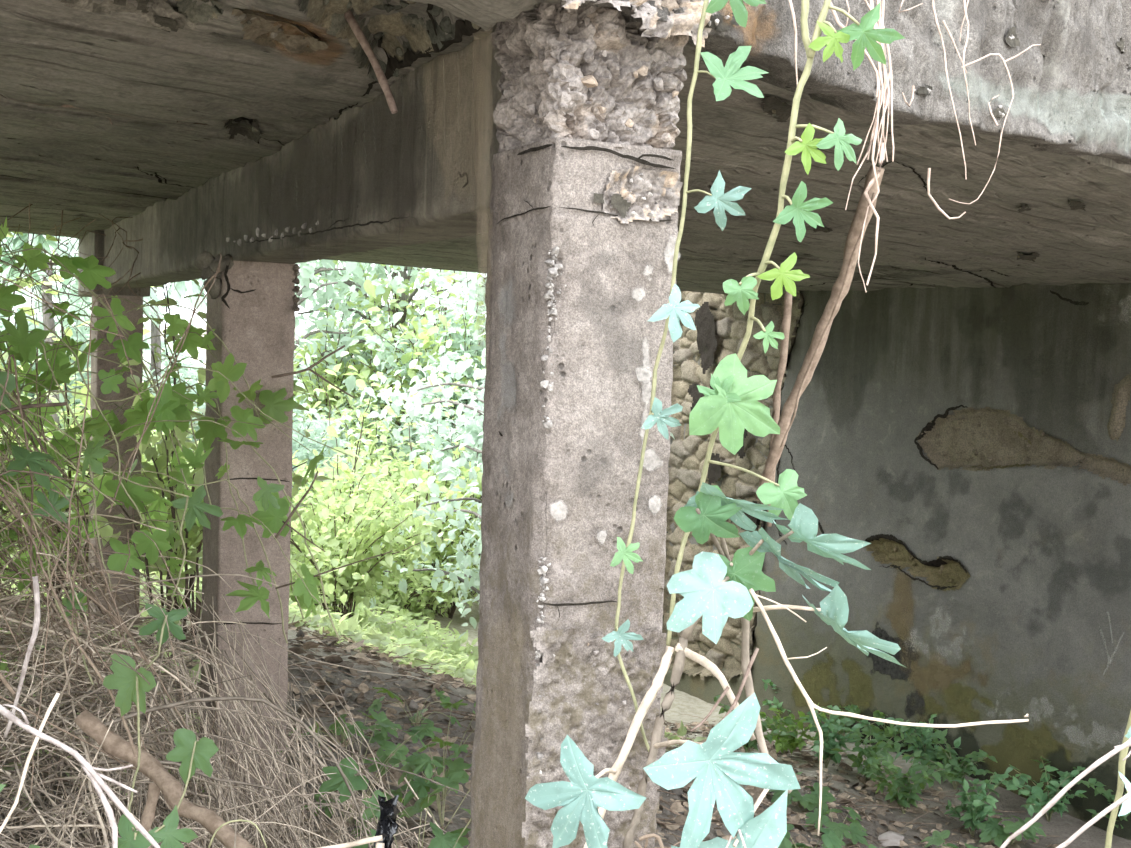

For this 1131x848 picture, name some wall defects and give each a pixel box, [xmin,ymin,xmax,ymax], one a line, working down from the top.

spalling [113,0,482,114]
spalling [561,0,739,48]
crack [517,144,675,169]
crack [497,200,620,226]
peeling [1107,373,1131,441]
flaking render [914,405,1131,486]
flaking render [863,534,971,591]
damp [866,622,927,717]